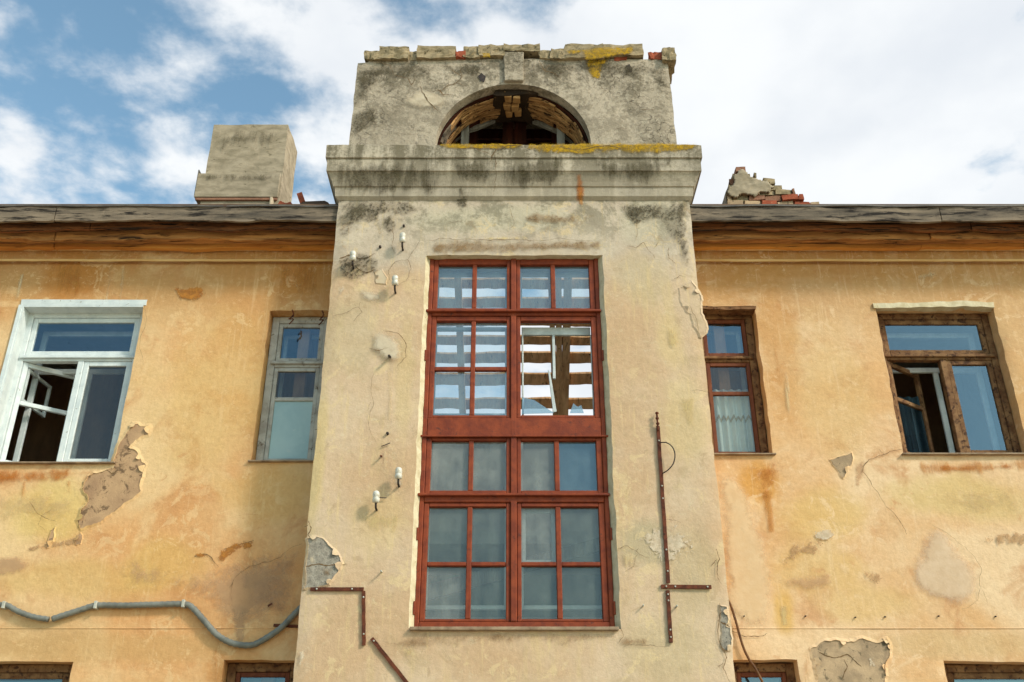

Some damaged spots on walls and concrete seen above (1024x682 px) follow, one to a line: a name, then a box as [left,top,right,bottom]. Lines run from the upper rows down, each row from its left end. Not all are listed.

leakage [341,163,435,231]
leakage [457,164,487,206]
leakage [513,159,559,185]
leakage [624,204,687,256]
leakage [339,254,376,278]
peeling [678,280,709,338]
peeling [29,421,153,550]
peeling [828,452,863,480]
crack [862,449,907,534]
spalling [302,535,345,591]
spalling [718,605,733,652]
peeling [808,635,893,682]